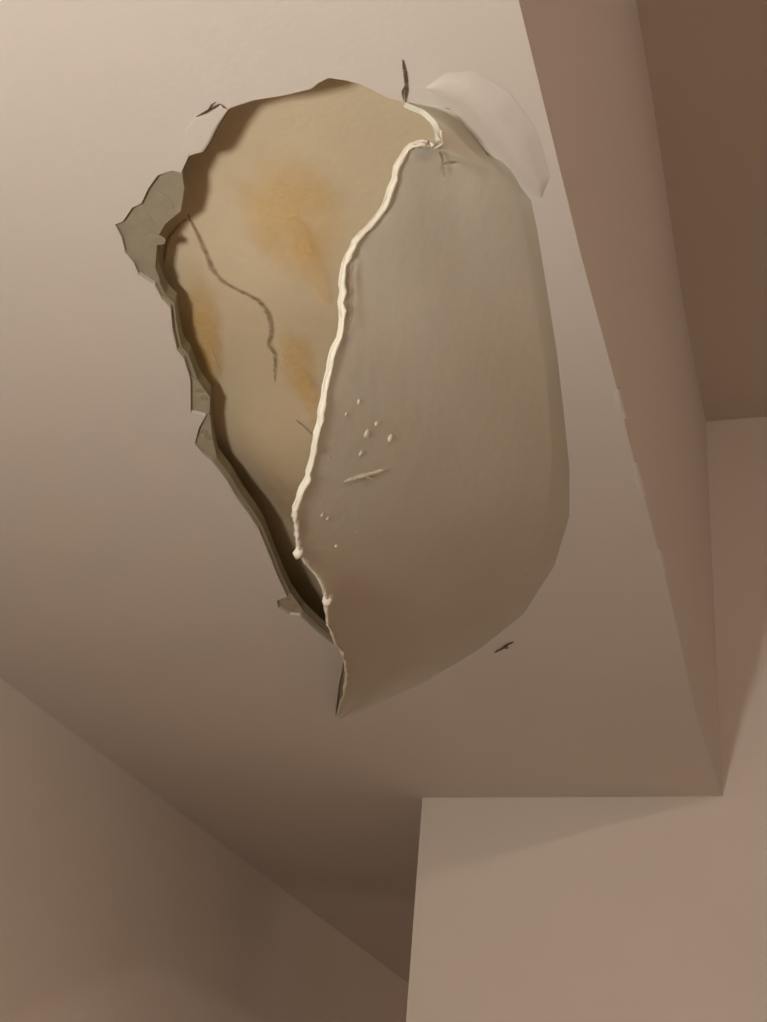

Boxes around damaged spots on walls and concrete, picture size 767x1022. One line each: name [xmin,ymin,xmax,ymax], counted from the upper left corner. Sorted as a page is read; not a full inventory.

crack [164,214,276,382]
peeling [118,106,334,641]
peeling [336,662,345,713]